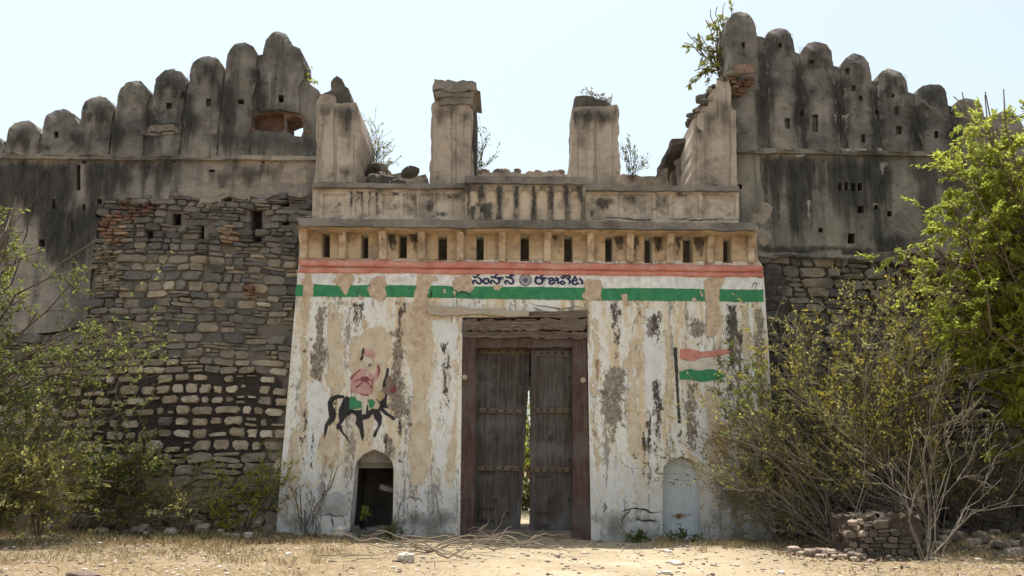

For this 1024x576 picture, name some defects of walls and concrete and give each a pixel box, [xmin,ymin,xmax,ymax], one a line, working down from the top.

water stain [0,128,173,280]
water stain [149,77,197,148]
water stain [198,63,308,149]
water stain [466,185,519,220]
water stain [549,186,583,215]
water stain [757,77,967,255]
peeling [274,270,475,514]
peeling [582,278,709,495]
peeling [688,277,766,427]